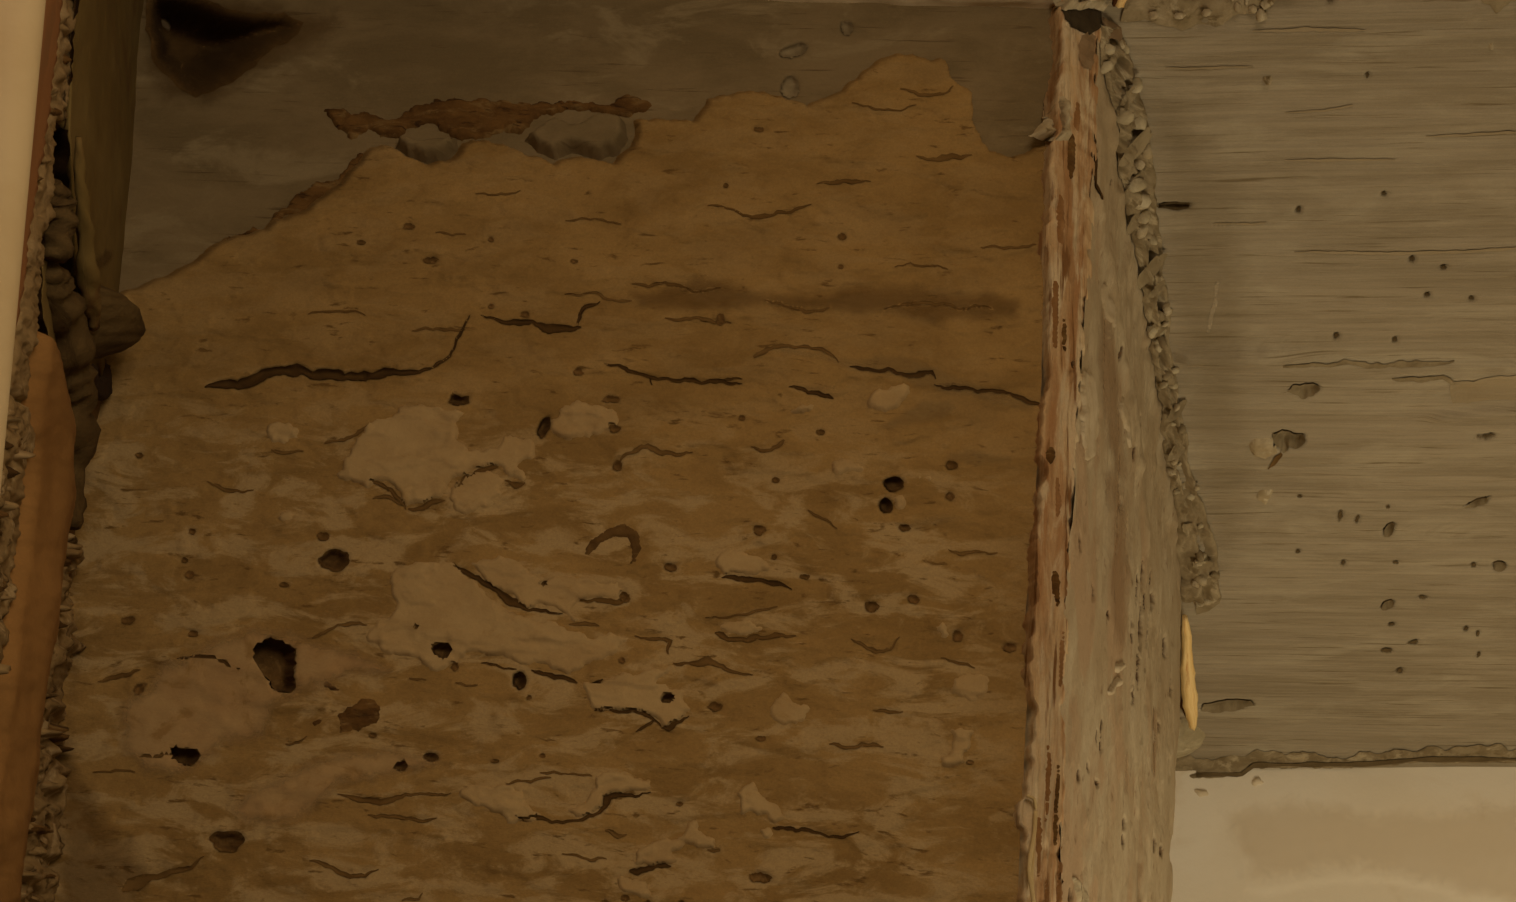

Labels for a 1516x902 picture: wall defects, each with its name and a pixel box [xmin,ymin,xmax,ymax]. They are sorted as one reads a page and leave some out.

crack [852,86,953,111]
crack [916,153,972,162]
spalling [0,0,76,675]
crack [204,281,731,389]
crack [604,299,1040,405]
crack [271,425,367,454]
crack [620,443,693,462]
spalling [119,0,1276,902]
crack [372,465,525,511]
crack [829,709,903,749]
spalling [1175,744,1516,797]
crack [309,860,379,879]